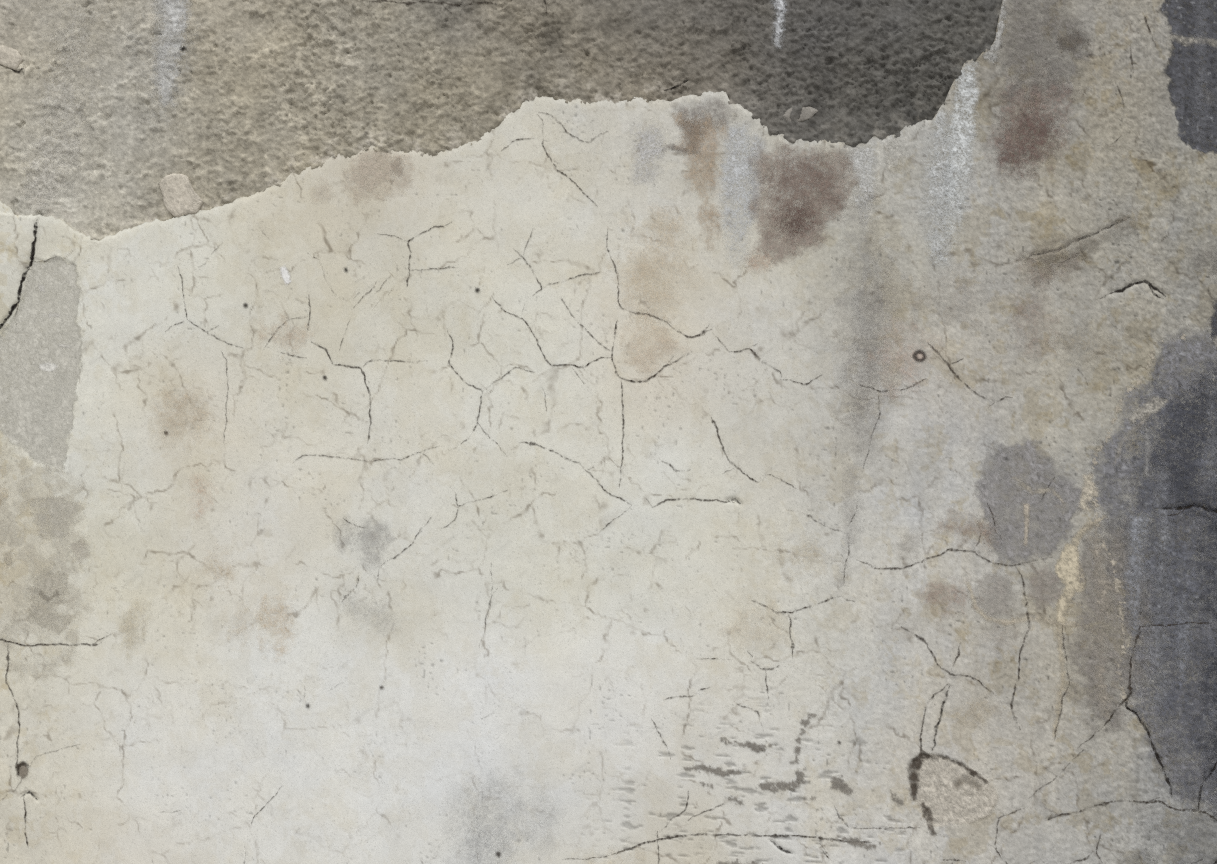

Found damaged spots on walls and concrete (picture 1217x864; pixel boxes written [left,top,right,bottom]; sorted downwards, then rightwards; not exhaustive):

crack [0,222,52,328]
peeling [0,255,82,519]
crack [268,226,447,461]
peeling [0,0,1002,241]
crack [448,234,821,529]
leakage [680,101,763,249]
peeling [1161,0,1217,154]
crack [568,790,913,862]
crack [737,503,1030,750]
spalling [909,753,998,834]
crack [1048,622,1217,821]
leakage [1063,303,1217,864]